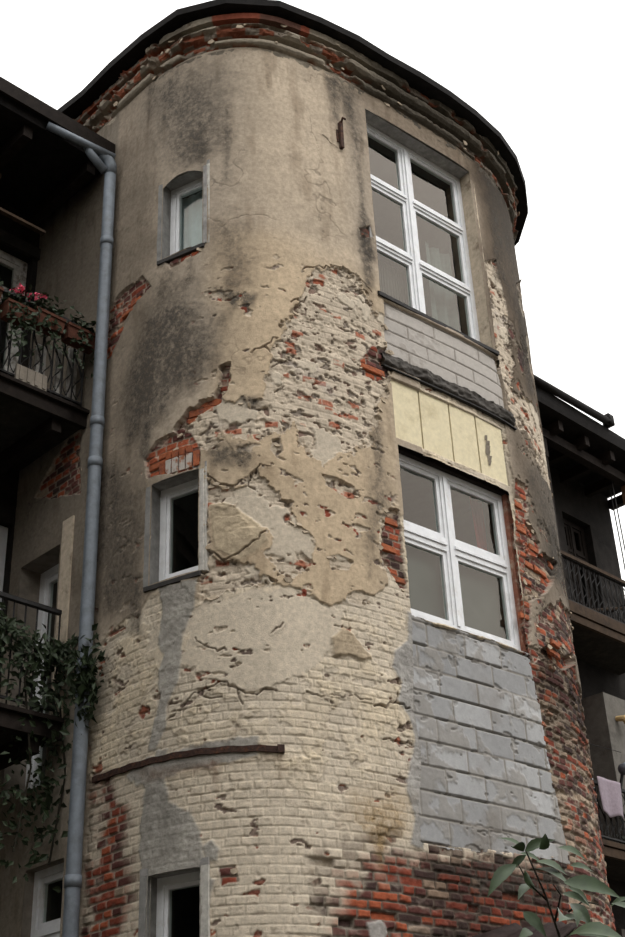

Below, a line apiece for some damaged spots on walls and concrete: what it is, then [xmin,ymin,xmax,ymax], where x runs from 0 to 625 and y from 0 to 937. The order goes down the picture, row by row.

water stain [361,212,372,284]
spalling [107,275,151,360]
water stain [224,283,255,306]
water stain [124,302,212,457]
peeling [484,258,553,499]
peeling [144,268,394,603]
peeling [346,589,371,607]
spalling [377,506,408,592]
spalling [514,478,576,671]
spalling [218,864,239,887]